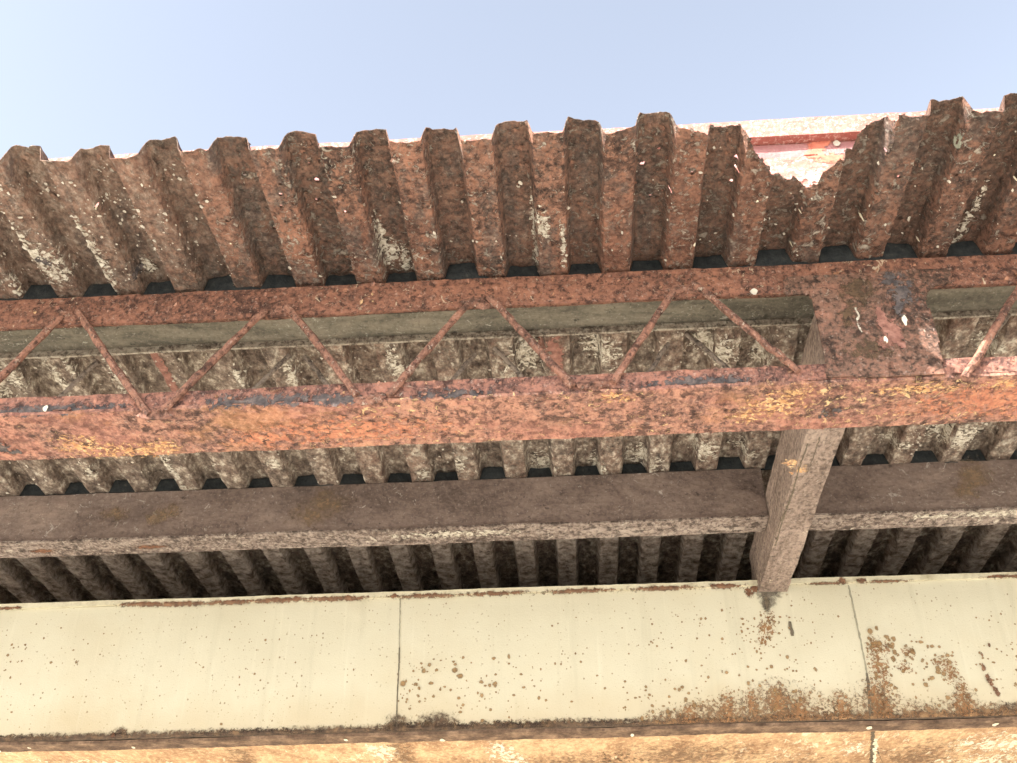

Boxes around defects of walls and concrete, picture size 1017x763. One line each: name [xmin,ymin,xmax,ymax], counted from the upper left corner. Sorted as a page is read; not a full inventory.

peeling [798,140,844,187]
rust [601,390,635,403]
rust [726,383,820,425]
rust [869,379,1017,420]
rust [0,443,22,454]
rust [55,435,183,459]
rust [220,413,458,449]
rust [622,605,1017,725]
rust [398,654,547,722]